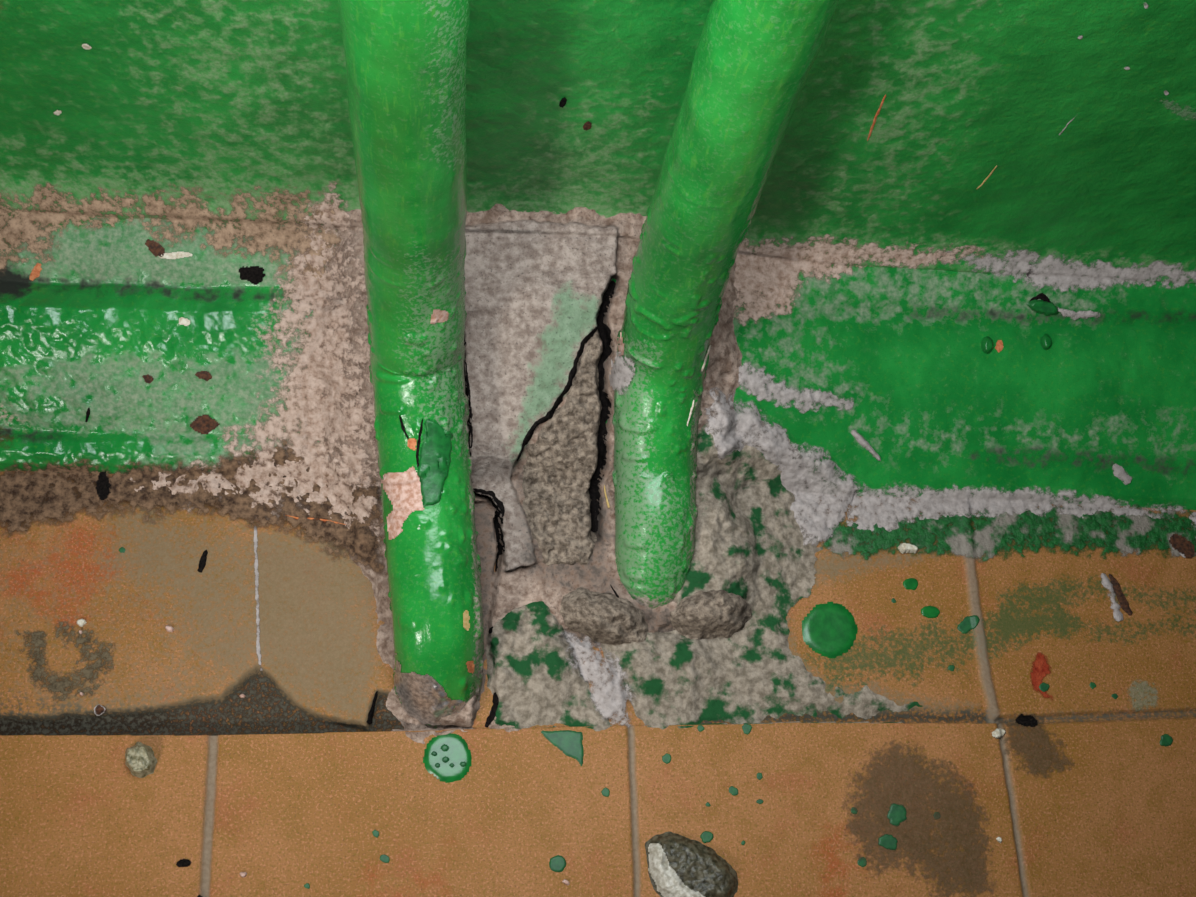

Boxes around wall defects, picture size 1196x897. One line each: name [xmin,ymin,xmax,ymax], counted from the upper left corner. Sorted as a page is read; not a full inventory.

peeling [29,263,42,281]
peeling [145,239,193,259]
spalling [190,181,453,540]
crack [464,334,505,571]
spalling [522,330,606,566]
crack [516,281,616,532]
spalling [673,421,819,627]
peeling [1026,293,1100,320]
spalling [1169,534,1195,558]
water stain [17,622,114,701]
crack [485,692,499,727]
water stain [848,745,990,897]